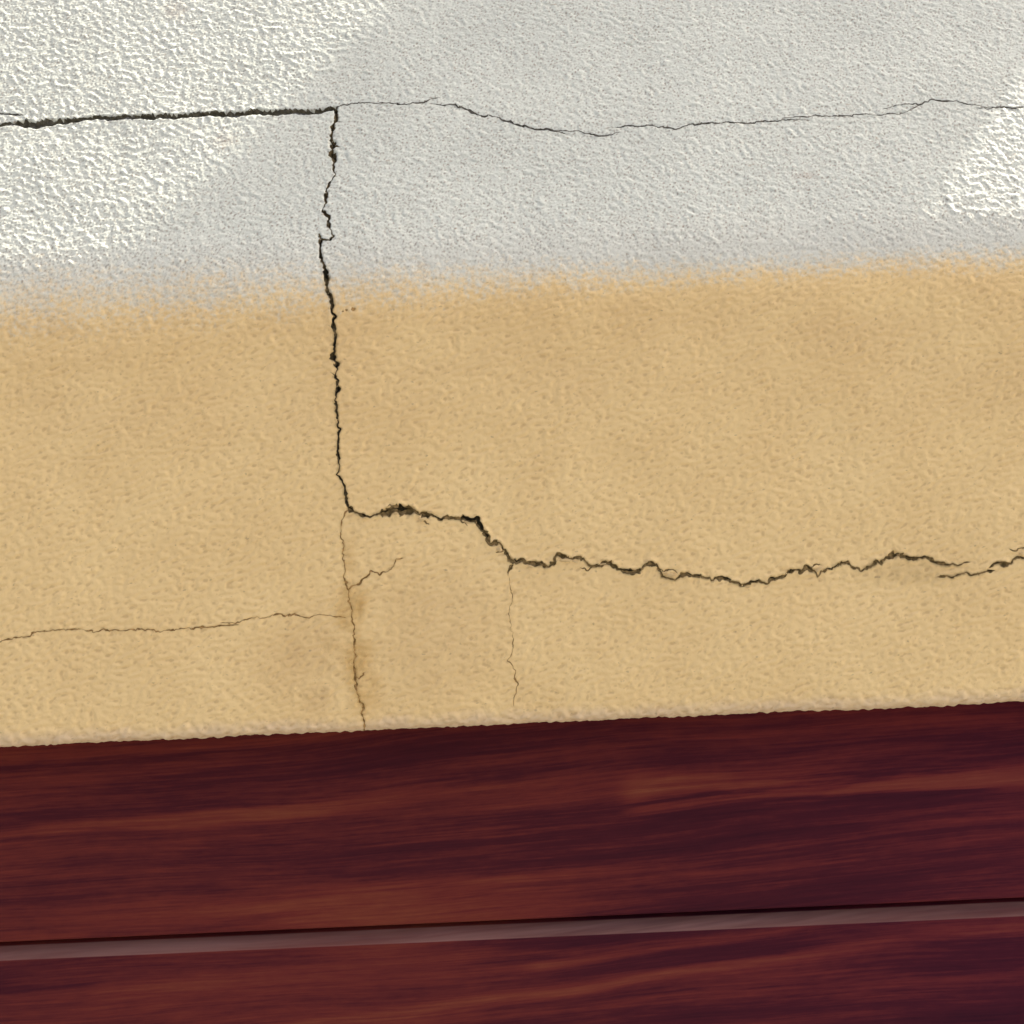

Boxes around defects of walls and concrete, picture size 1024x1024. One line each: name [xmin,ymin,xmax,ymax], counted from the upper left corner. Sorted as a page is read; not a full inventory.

crack [0,98,1024,731]